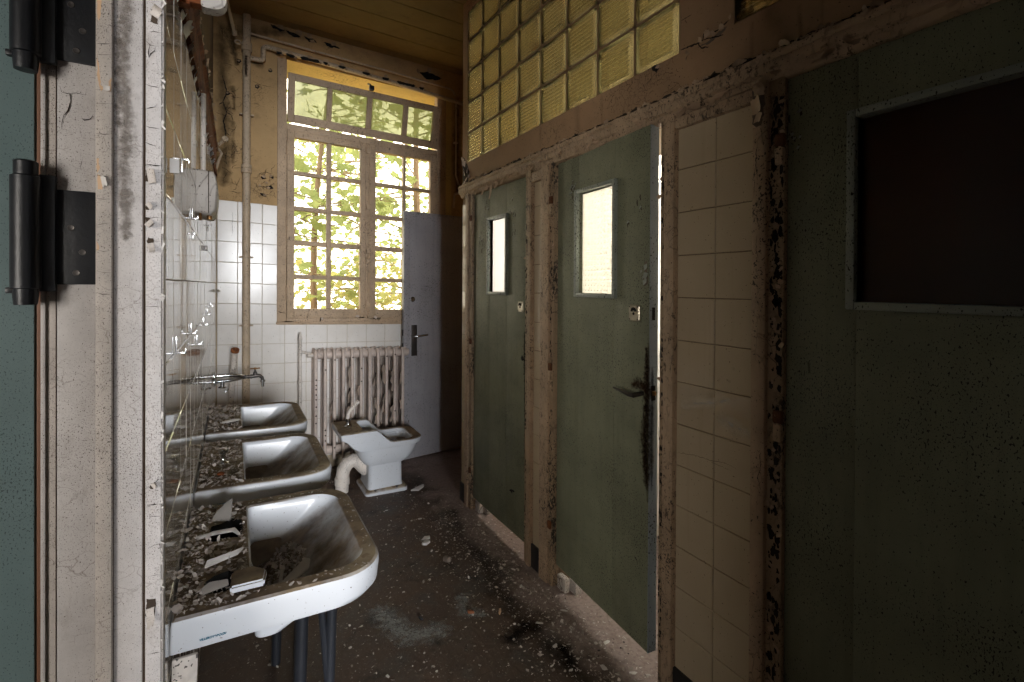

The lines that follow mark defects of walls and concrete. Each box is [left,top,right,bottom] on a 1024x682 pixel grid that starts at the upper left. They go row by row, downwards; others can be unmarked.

peeling [271,24,348,70]
peeling [362,68,441,91]
peeling [145,156,165,192]
crack [218,76,277,230]
peeling [461,157,522,192]
peeling [144,202,165,253]
peeling [750,82,785,393]
damp [644,348,653,502]
peeling [764,404,782,681]